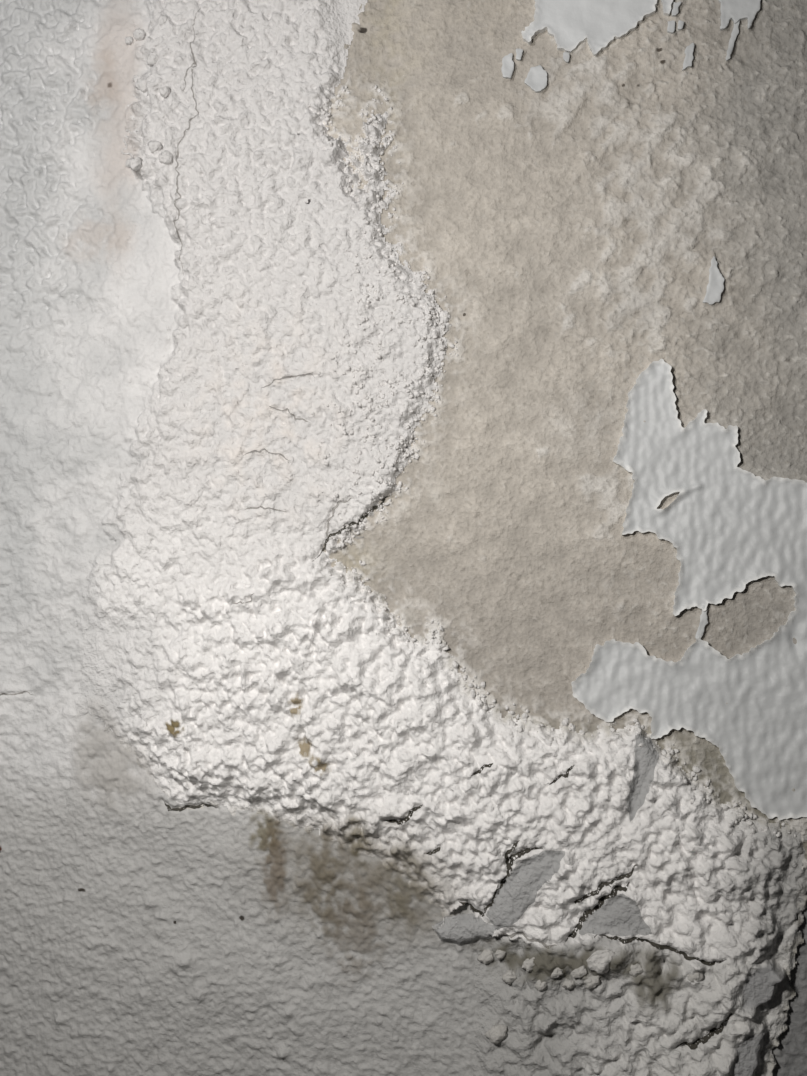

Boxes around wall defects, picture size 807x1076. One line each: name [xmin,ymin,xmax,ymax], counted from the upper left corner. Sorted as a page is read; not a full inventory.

flaking render [323,0,807,870]
crack [313,495,390,561]
flaking render [74,532,807,969]
flaking render [502,957,535,984]
flaking render [535,949,615,992]
flaking render [629,963,644,977]